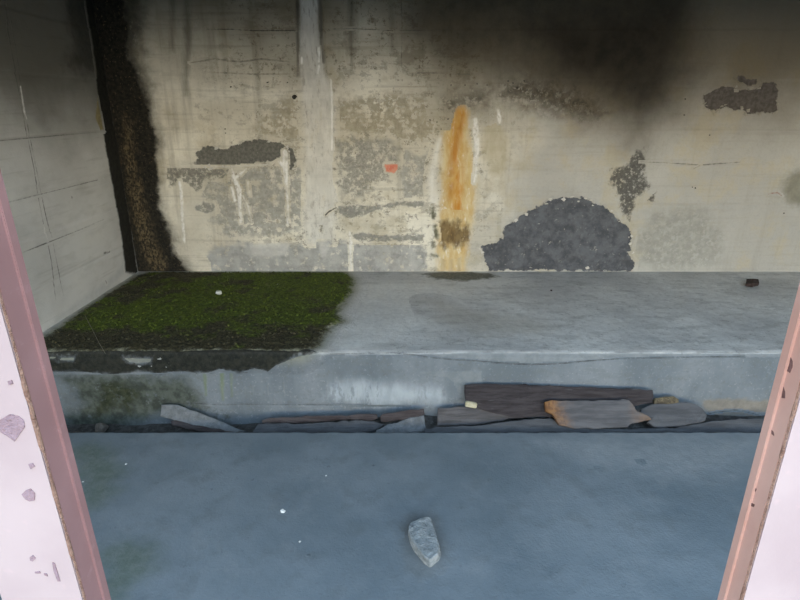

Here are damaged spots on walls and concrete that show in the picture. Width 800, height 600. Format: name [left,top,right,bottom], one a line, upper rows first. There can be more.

peeling [165,78,302,241]
leakage [41,0,758,332]
corrosion [422,105,487,271]
spalling [477,138,660,272]
spalling [699,70,783,119]